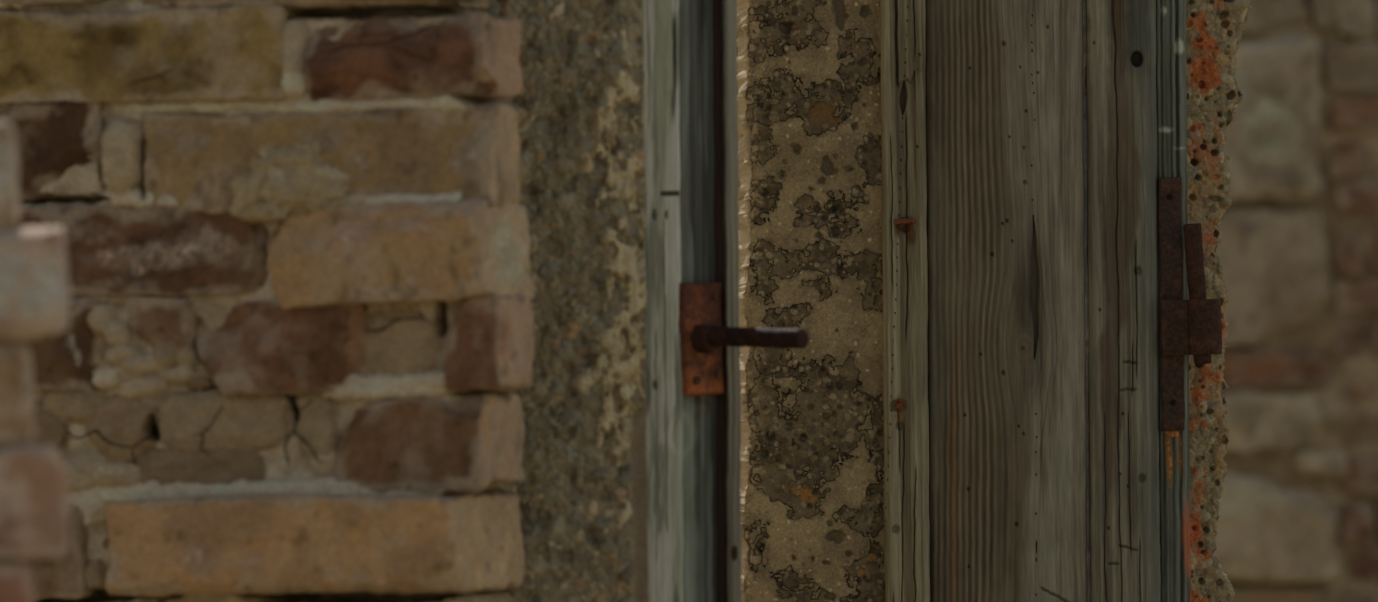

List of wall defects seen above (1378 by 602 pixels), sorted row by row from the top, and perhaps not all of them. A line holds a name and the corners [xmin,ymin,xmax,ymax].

spalling [745,0,883,329]
spalling [744,347,885,602]